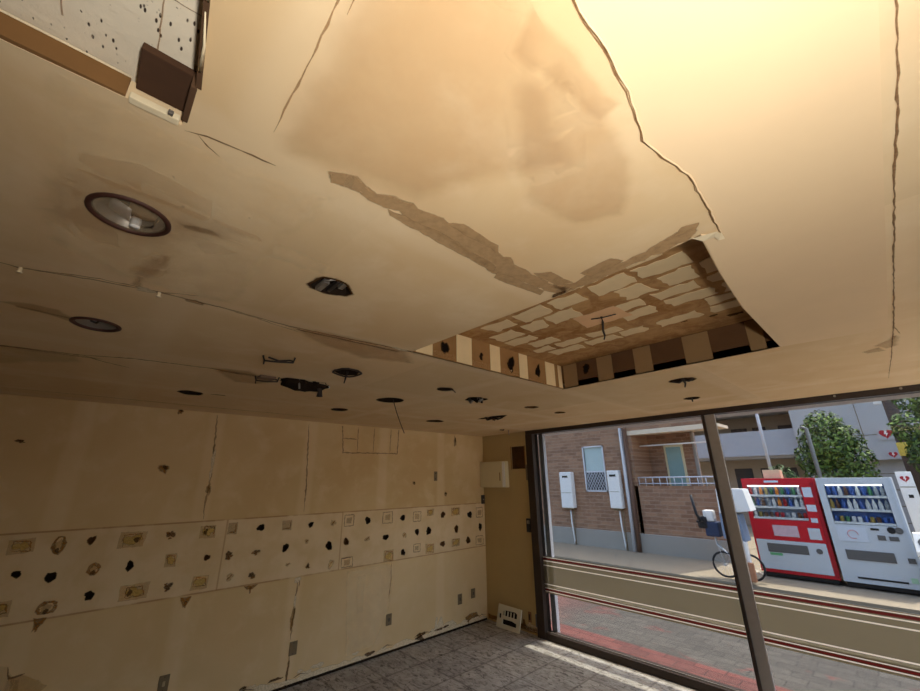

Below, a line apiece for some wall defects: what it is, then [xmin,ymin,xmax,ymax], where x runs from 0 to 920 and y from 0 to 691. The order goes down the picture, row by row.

crack [277,0,354,126]
crack [888,0,900,378]